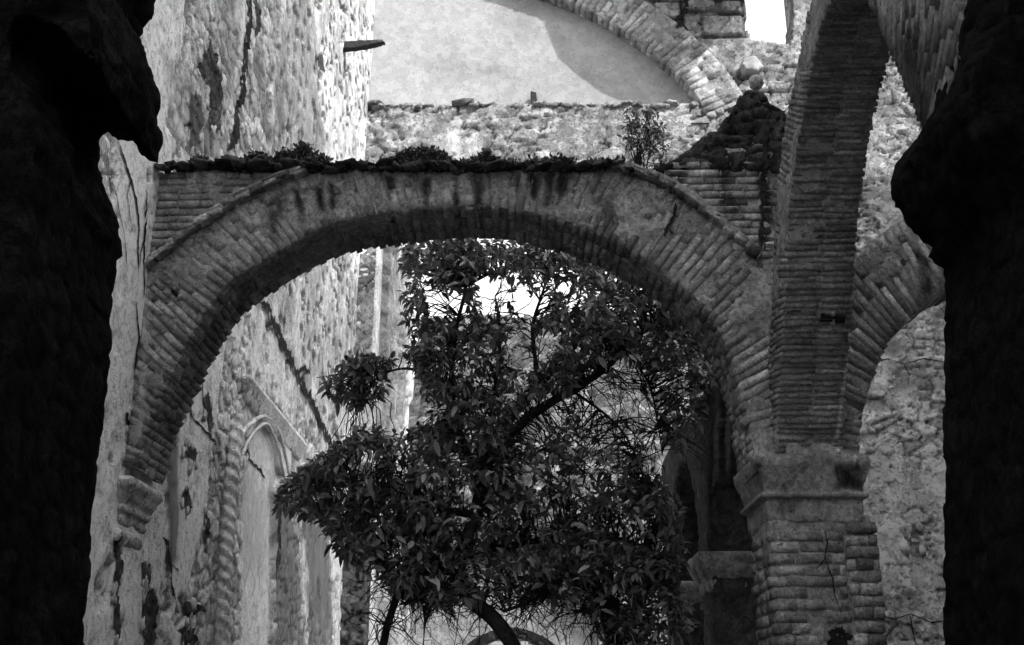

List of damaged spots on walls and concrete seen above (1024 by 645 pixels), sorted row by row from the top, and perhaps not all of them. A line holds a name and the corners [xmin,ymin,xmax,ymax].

crack [229,0,253,153]
crack [259,300,332,446]
flaking render [179,437,212,550]
spalling [103,529,128,645]
spalling [139,559,160,645]
spalling [175,591,207,645]
crack [816,531,841,612]